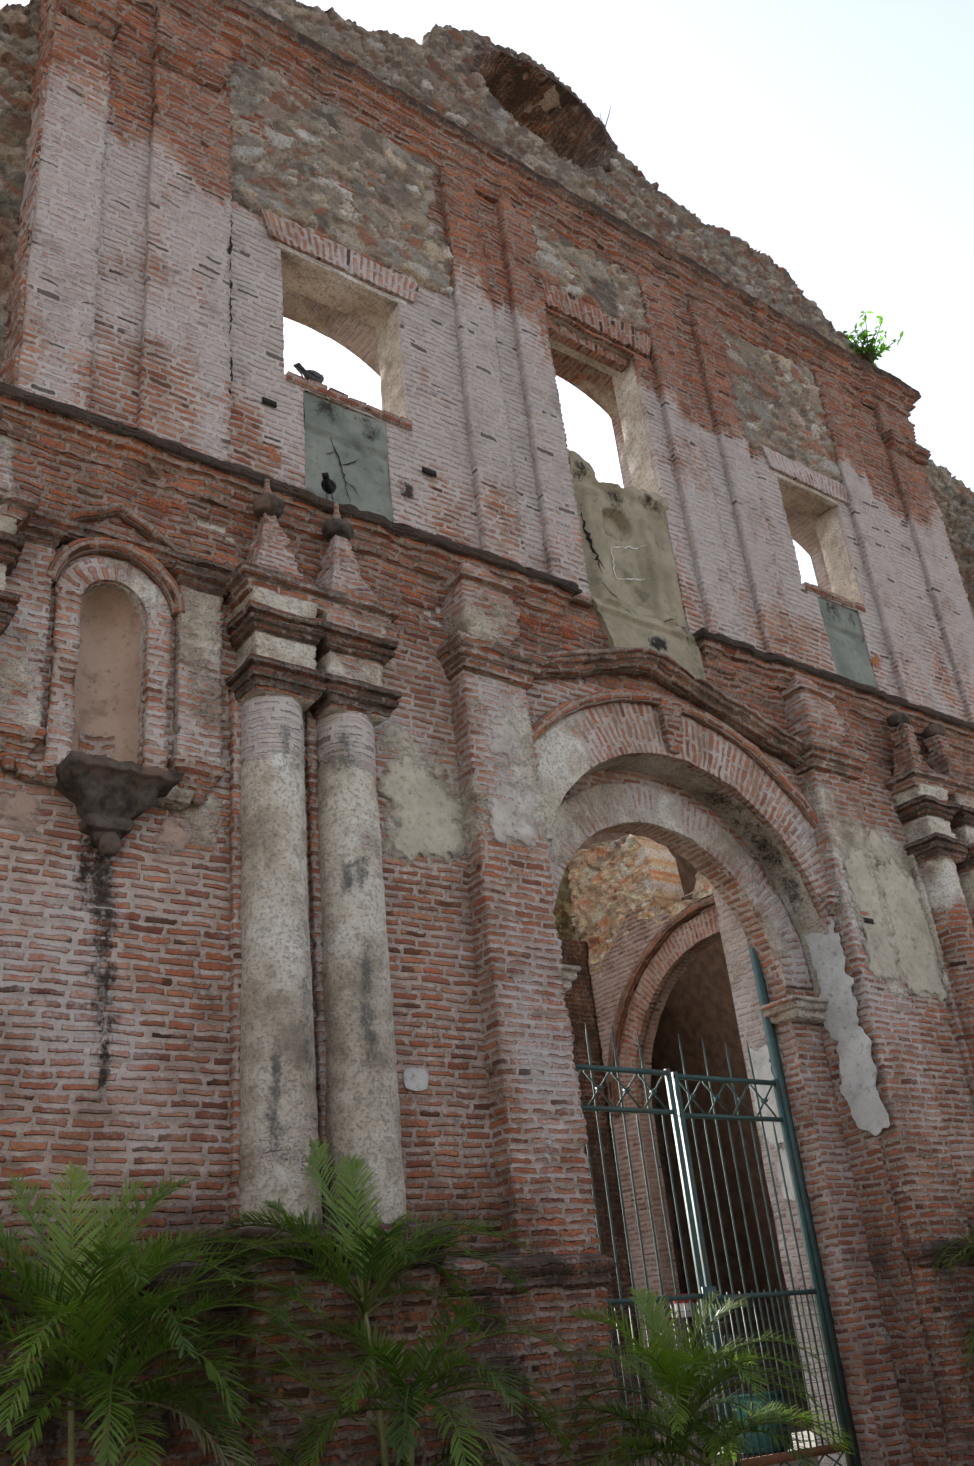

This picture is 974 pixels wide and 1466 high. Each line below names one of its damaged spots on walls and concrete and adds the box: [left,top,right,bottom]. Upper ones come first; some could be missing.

crack [581,513,690,646]
peeling [379,722,466,869]
peeling [487,782,539,847]
water stain [76,839,122,1088]
peeling [804,920,890,1136]
peeling [844,827,948,1002]